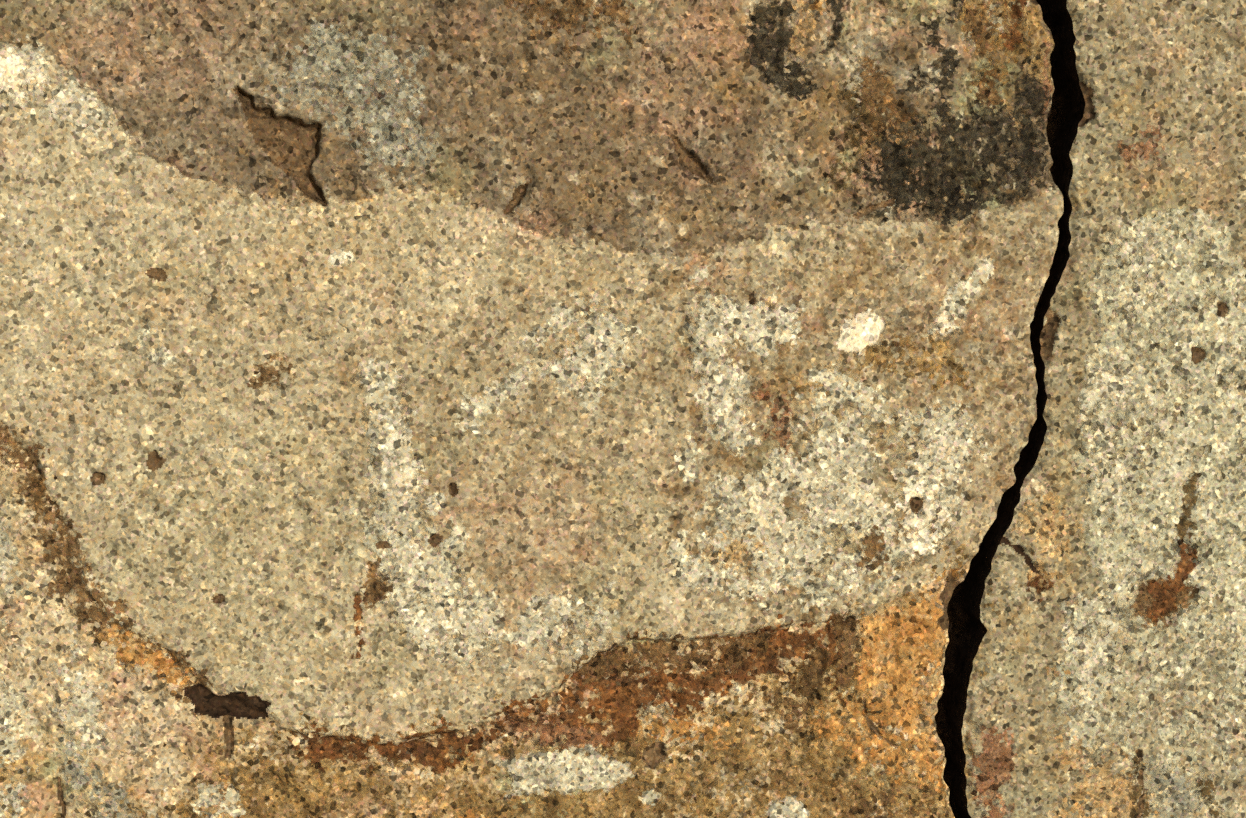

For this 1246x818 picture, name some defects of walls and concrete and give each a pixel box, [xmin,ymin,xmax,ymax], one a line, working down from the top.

leakage [821,0,1051,226]
crack [934,0,1096,818]
corrosion [1129,472,1202,630]